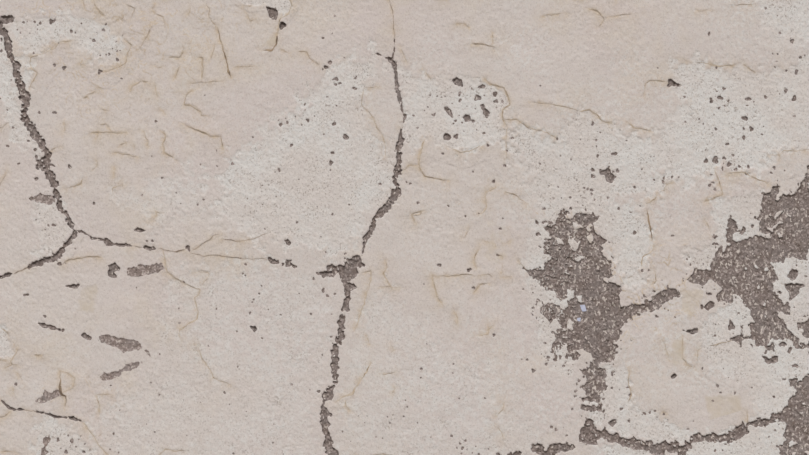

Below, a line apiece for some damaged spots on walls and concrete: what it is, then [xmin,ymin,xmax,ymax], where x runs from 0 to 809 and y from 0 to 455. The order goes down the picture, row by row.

crack [0,372,110,455]
crack [0,3,297,385]
peeling [18,28,419,455]
peeling [230,0,299,30]
crack [266,0,318,64]
crack [319,0,445,455]
peeling [350,0,809,455]